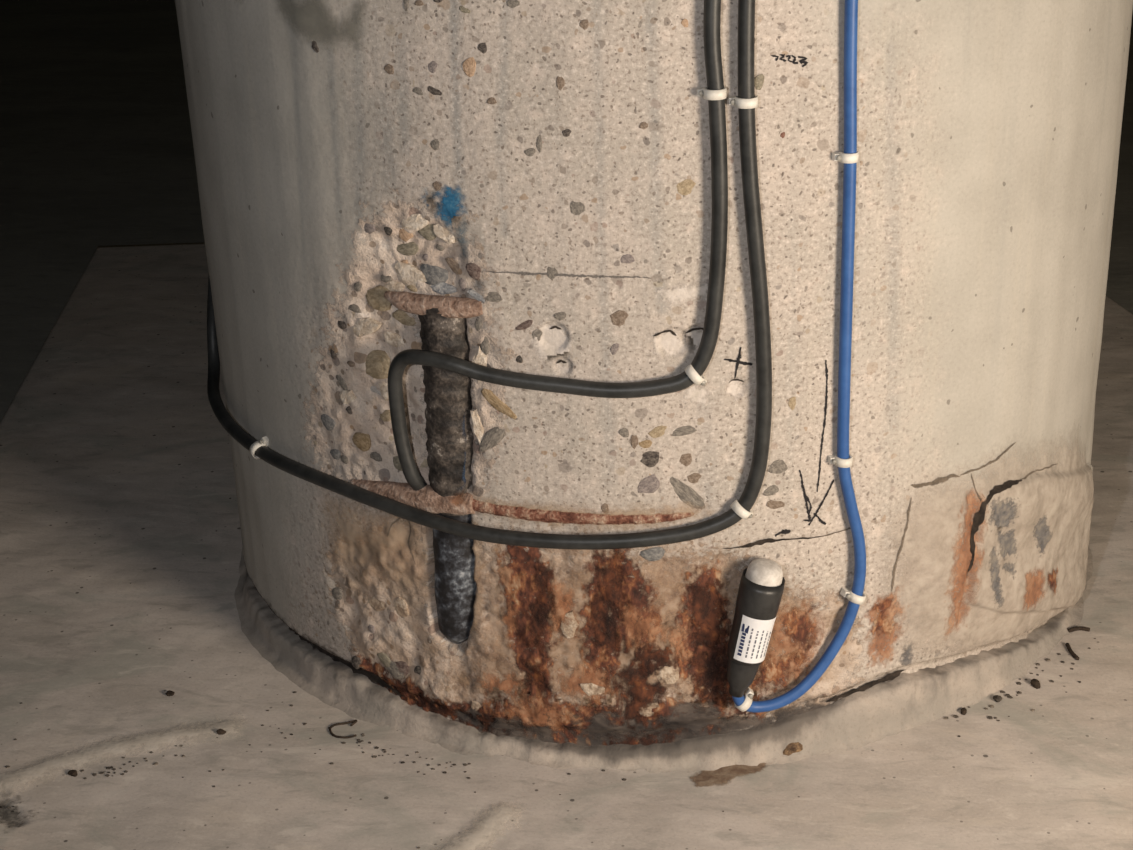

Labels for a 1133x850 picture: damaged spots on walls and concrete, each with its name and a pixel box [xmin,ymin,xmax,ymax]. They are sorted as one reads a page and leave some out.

water stain [280,0,362,41]
spalling [301,179,705,535]
flaking render [763,460,788,509]
crack [891,442,1057,594]
rust [357,540,820,744]
spalling [325,511,874,730]
rust [869,588,903,662]